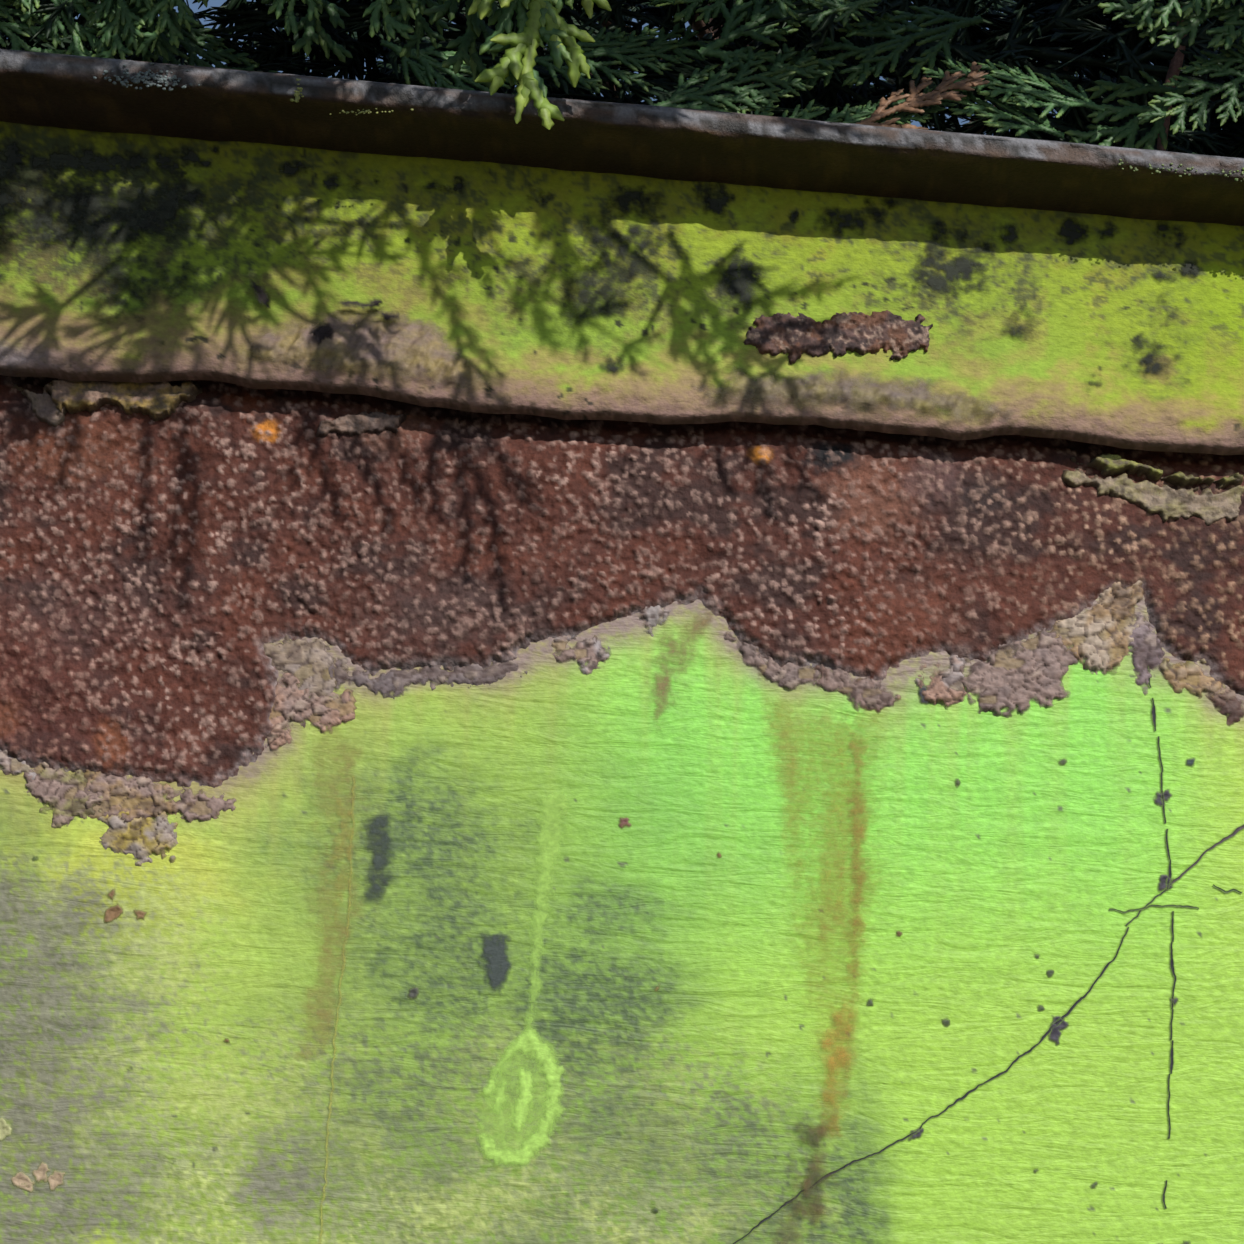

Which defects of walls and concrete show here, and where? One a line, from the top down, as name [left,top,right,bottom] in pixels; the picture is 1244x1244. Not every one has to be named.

mould [0,142,218,309]
mould [566,186,665,323]
mould [716,253,763,308]
mould [818,199,898,236]
mould [913,220,1018,295]
mould [1058,218,1117,245]
mould [1153,261,1199,279]
mould [600,357,623,373]
mould [1137,336,1164,374]
peeling [918,686,929,704]
crack [733,666,1244,1244]
corrosion [796,1117,837,1218]